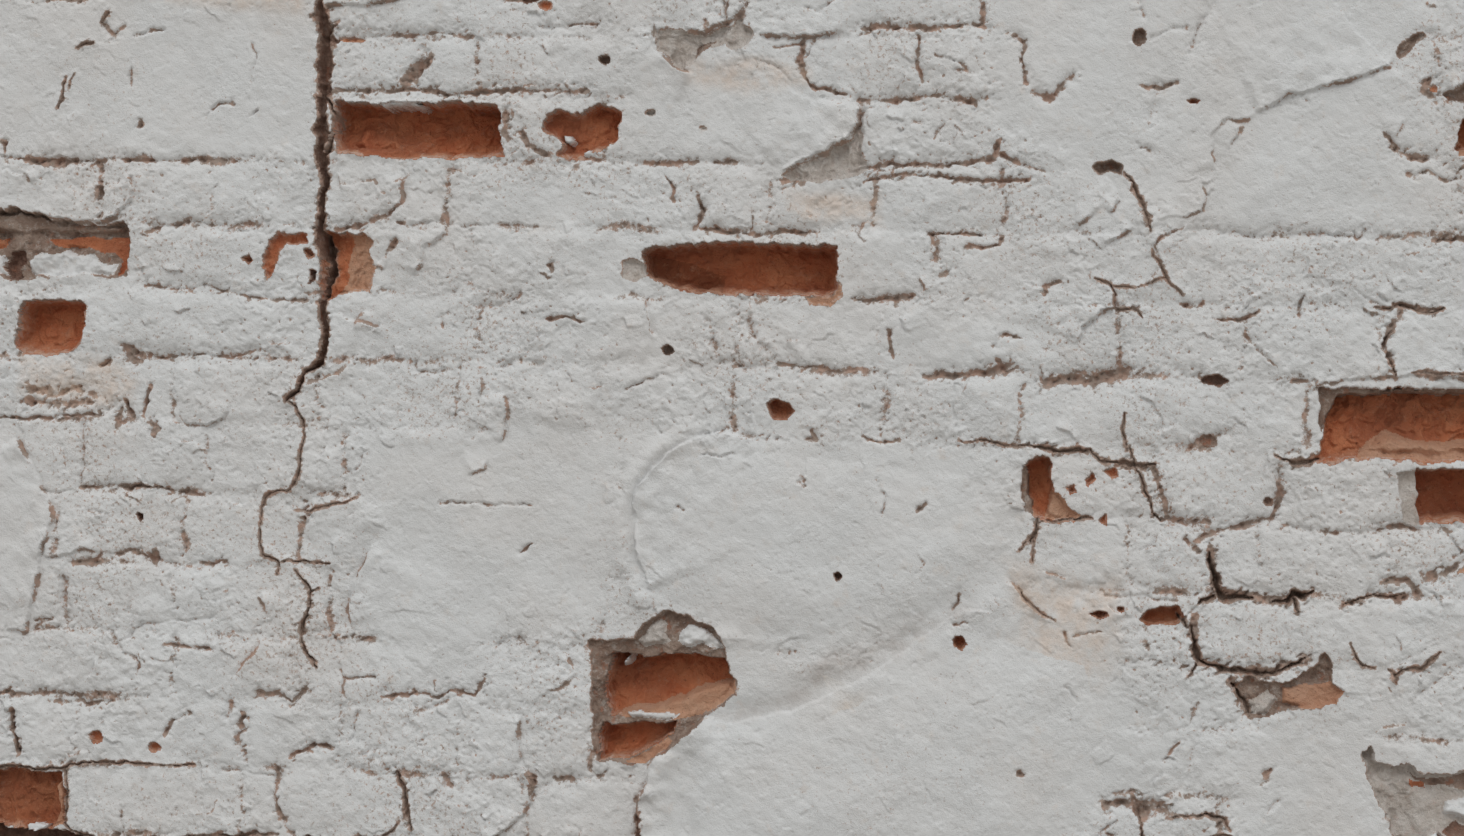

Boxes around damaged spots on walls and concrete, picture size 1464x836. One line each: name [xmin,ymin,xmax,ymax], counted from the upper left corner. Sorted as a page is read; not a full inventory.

spalling [332,101,505,216]
spalling [15,299,87,357]
spalling [0,174,138,281]
crack [260,0,355,668]
spalling [623,241,843,355]
crack [1095,175,1183,317]
crack [979,413,1159,519]
crack [1276,456,1319,467]
spalling [1308,387,1464,527]
crack [1020,516,1092,621]
crack [1177,553,1405,713]
spalling [588,611,738,836]